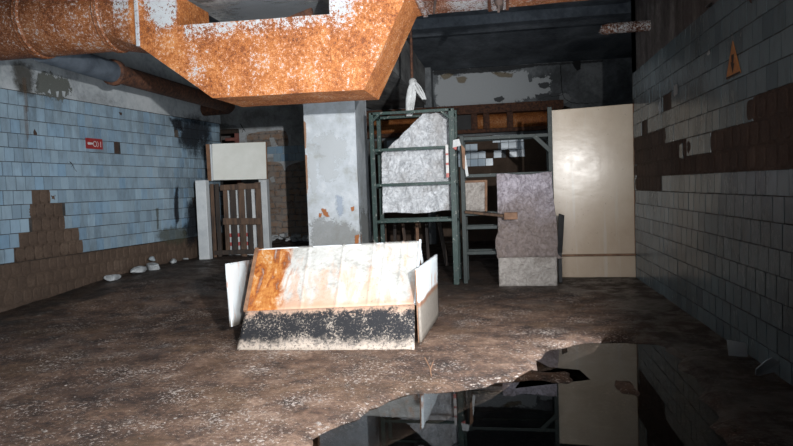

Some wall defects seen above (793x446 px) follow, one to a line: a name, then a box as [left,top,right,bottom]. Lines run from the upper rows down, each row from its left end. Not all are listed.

corrosion [121,66,235,116]
flaking render [435,70,552,107]
peeling [634,83,793,191]
peeling [0,190,199,309]